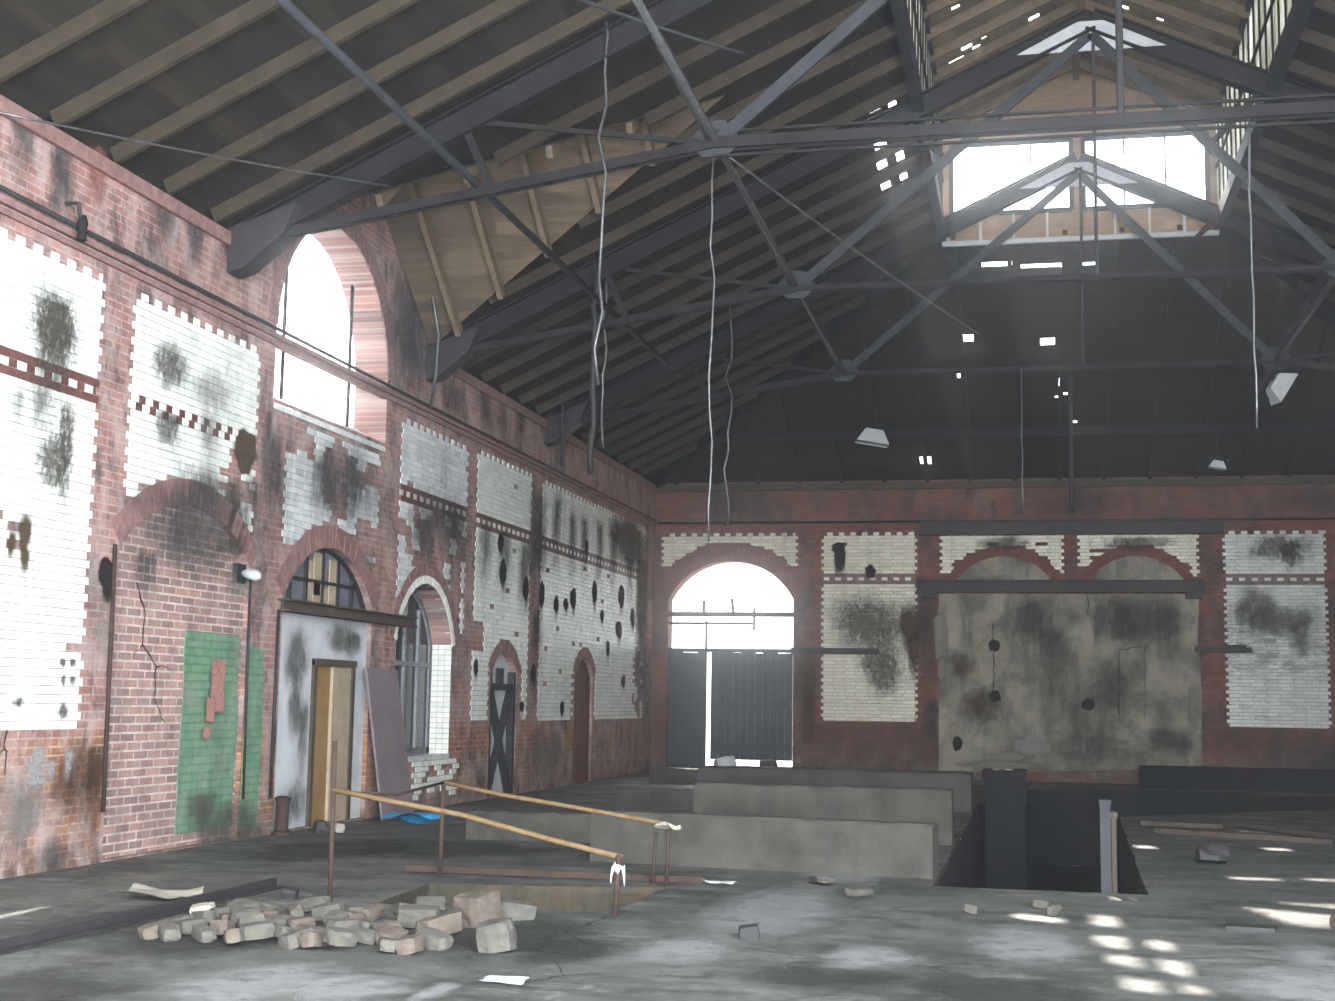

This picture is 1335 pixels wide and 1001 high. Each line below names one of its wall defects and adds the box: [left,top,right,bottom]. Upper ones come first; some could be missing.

leakage [60,407,74,482]
spalling [7,515,31,571]
leakage [899,606,919,674]
leakage [1237,591,1312,643]
peeling [202,659,226,739]
leakage [288,634,308,745]